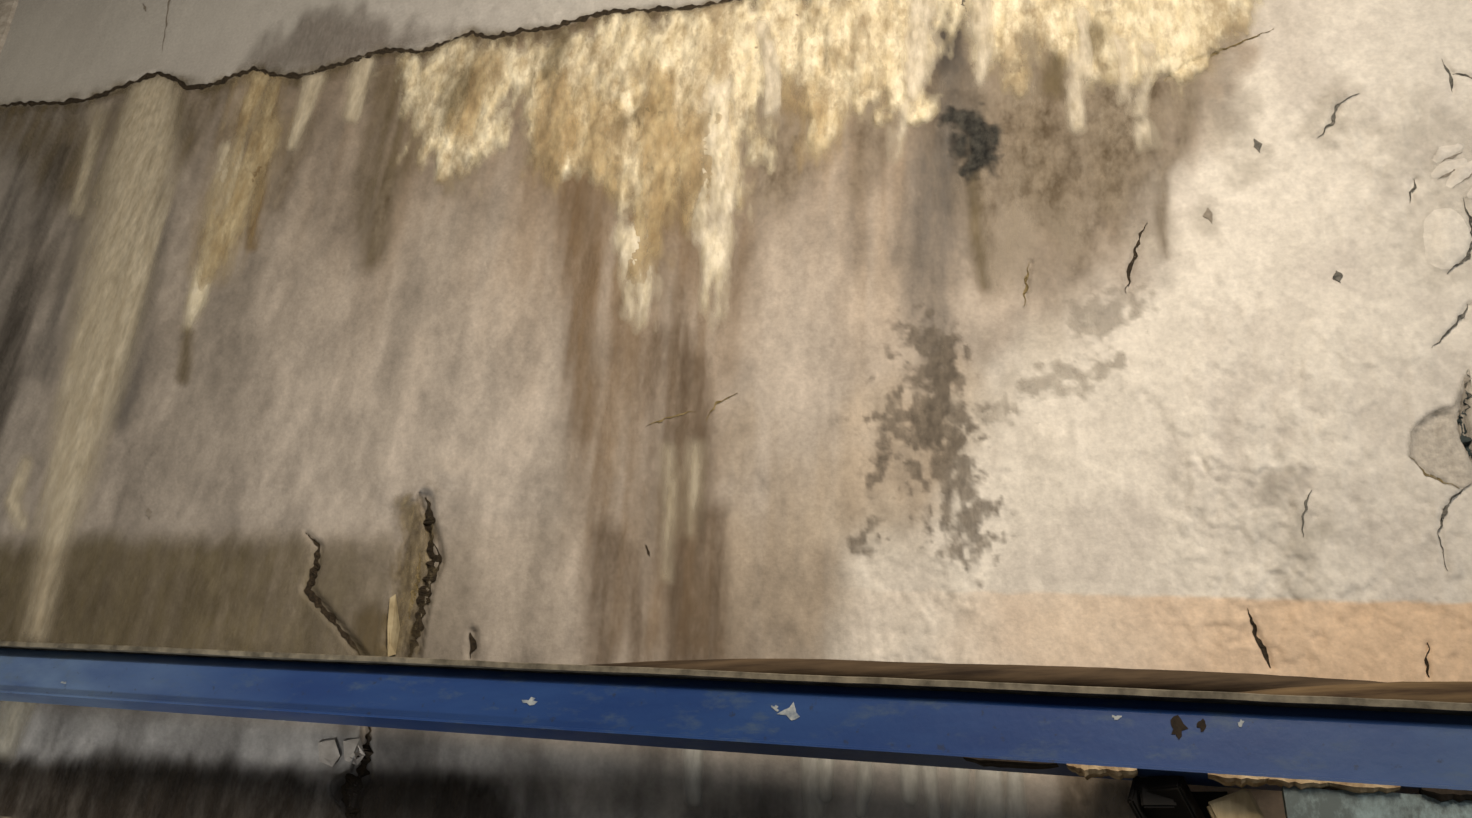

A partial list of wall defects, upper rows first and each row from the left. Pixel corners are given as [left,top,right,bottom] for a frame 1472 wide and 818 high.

damp [0,77,323,654]
damp [179,20,383,381]
damp [371,0,1261,324]
damp [865,311,998,564]
crack [1125,223,1147,294]
crack [304,533,361,656]
crack [1247,608,1271,668]